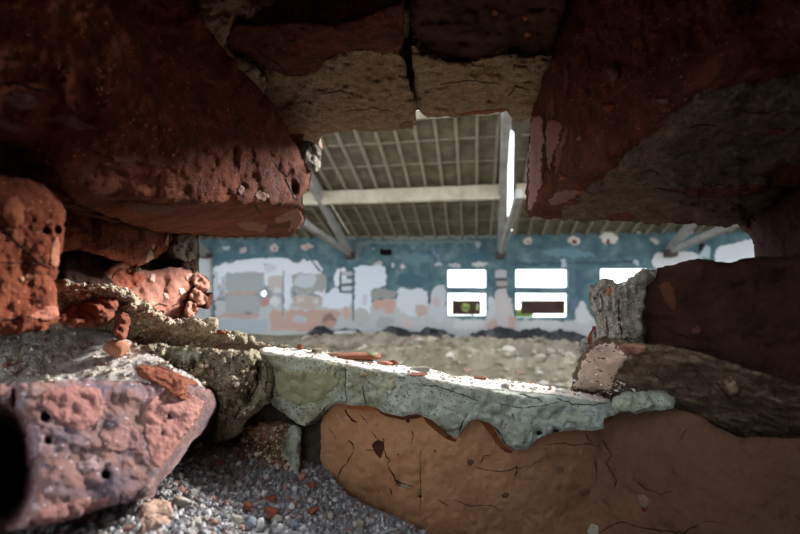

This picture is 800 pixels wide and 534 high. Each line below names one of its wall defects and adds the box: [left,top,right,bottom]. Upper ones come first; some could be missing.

spalling [0,0,596,346]
spalling [599,232,618,245]